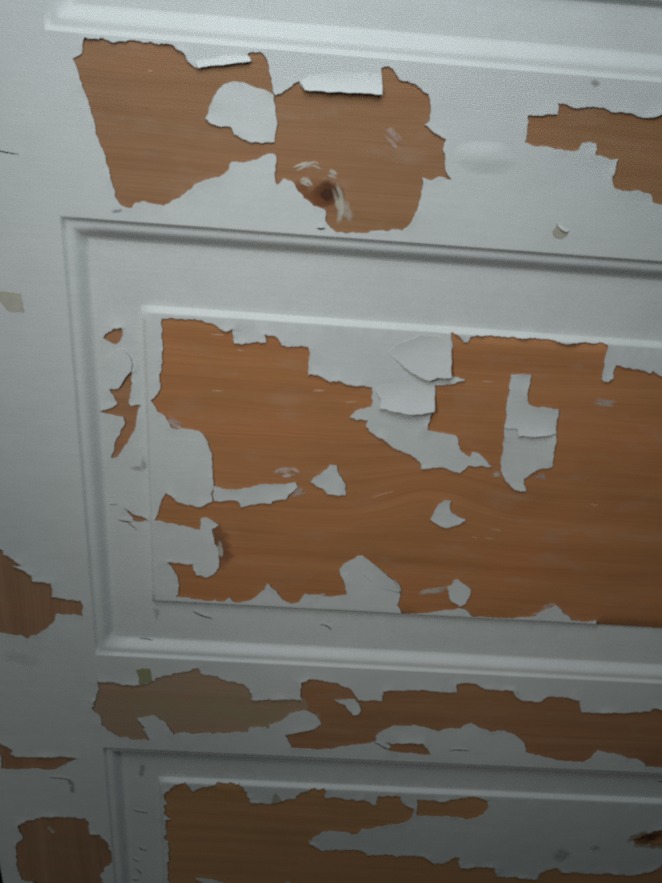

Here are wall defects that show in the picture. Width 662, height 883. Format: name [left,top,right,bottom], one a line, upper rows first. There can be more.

peeling [73,37,451,233]
peeling [525,103,662,205]
peeling [552,223,570,239]
peeling [101,328,141,458]
peeling [127,318,662,628]
peeling [0,549,83,639]
peeling [0,744,76,770]
peeling [92,668,662,768]
peeling [15,817,112,883]
peeling [164,782,662,883]